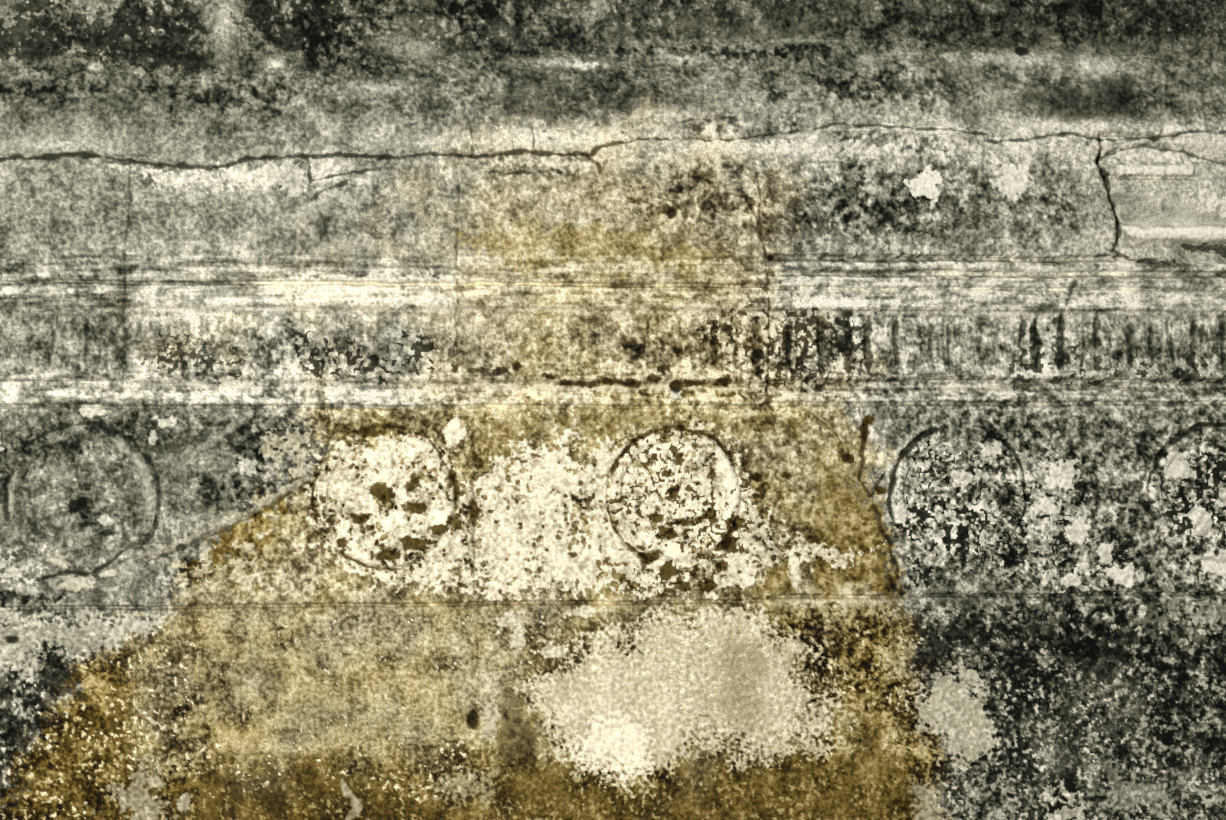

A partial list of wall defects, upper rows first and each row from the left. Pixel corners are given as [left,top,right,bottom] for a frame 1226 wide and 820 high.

crack [0,115,1226,463]
water stain [540,363,671,389]
water stain [635,340,647,356]
water stain [928,322,952,368]
water stain [1004,314,1226,403]
water stain [858,414,876,442]
water stain [0,319,294,820]
water stain [88,421,1226,820]